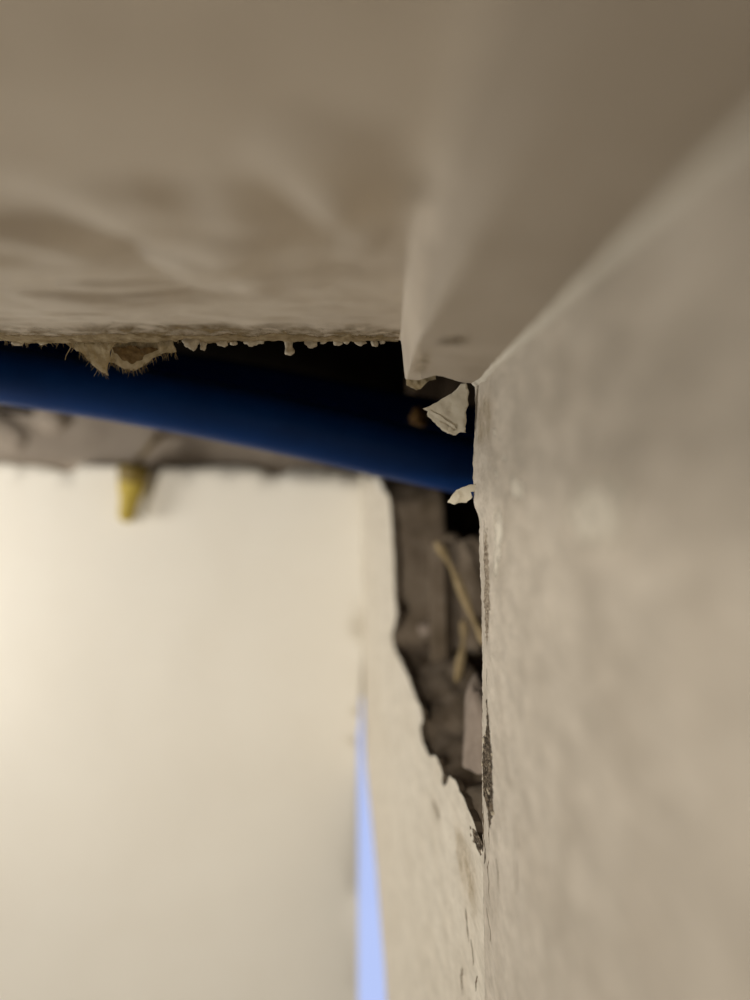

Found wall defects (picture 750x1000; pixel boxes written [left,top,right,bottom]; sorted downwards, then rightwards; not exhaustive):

flaking render [182,338,264,351]
peeling [423,383,469,435]
flaking render [365,474,494,837]